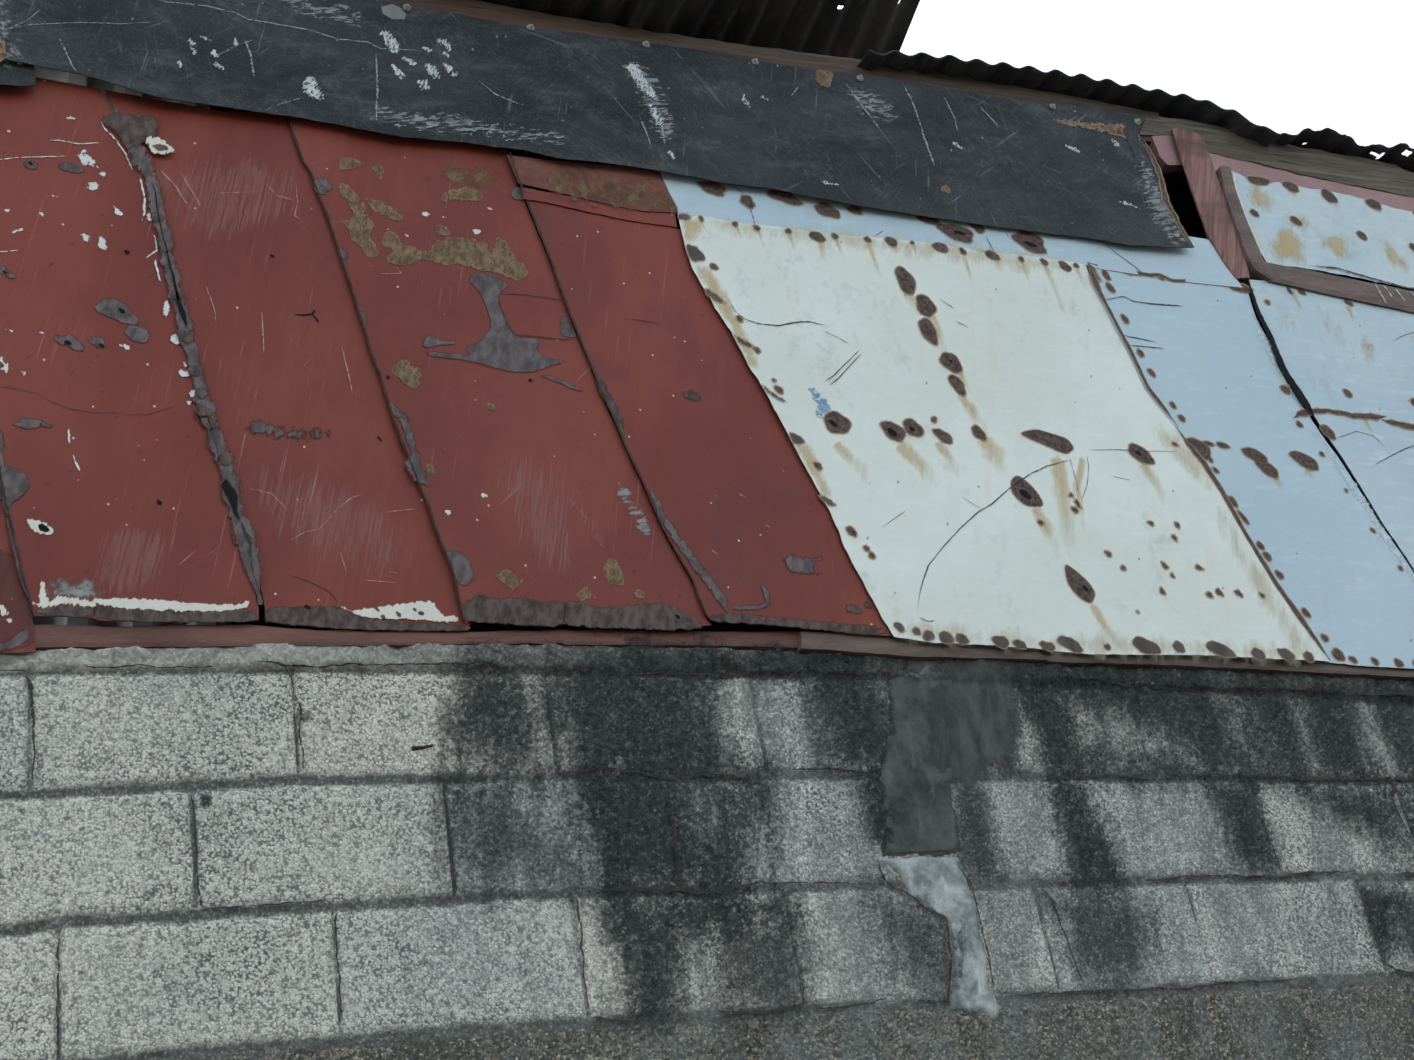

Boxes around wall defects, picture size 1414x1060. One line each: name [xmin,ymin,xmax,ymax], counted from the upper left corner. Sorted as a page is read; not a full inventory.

peeling [314,157,583,392]
rust [696,181,863,243]
rust [864,216,1001,261]
rust [894,266,966,397]
rust [879,416,953,445]
rust [1010,230,1414,668]
peeling [0,604,29,652]
peeling [32,550,886,635]
leakage [436,635,911,1033]
leakage [957,786,1000,881]
leakage [988,660,1414,986]
leakage [881,902,962,987]